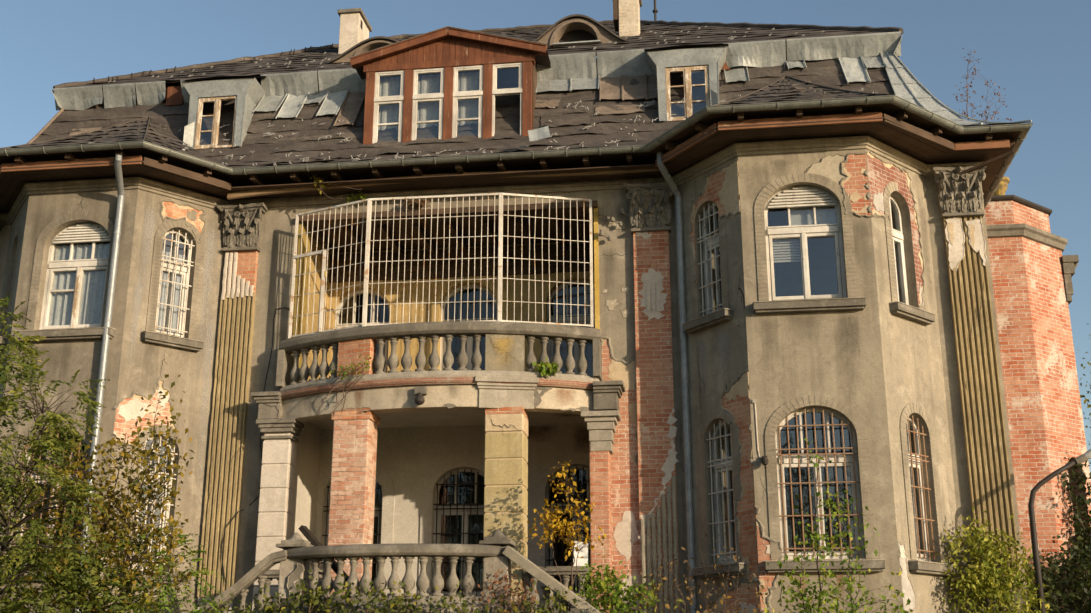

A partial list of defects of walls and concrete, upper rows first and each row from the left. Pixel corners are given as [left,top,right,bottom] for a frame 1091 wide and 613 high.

flaking render [159,198,206,244]
flaking render [687,159,741,287]
flaking render [804,150,925,309]
peeling [945,217,987,272]
flaking render [111,377,179,446]
flaking render [707,369,784,613]